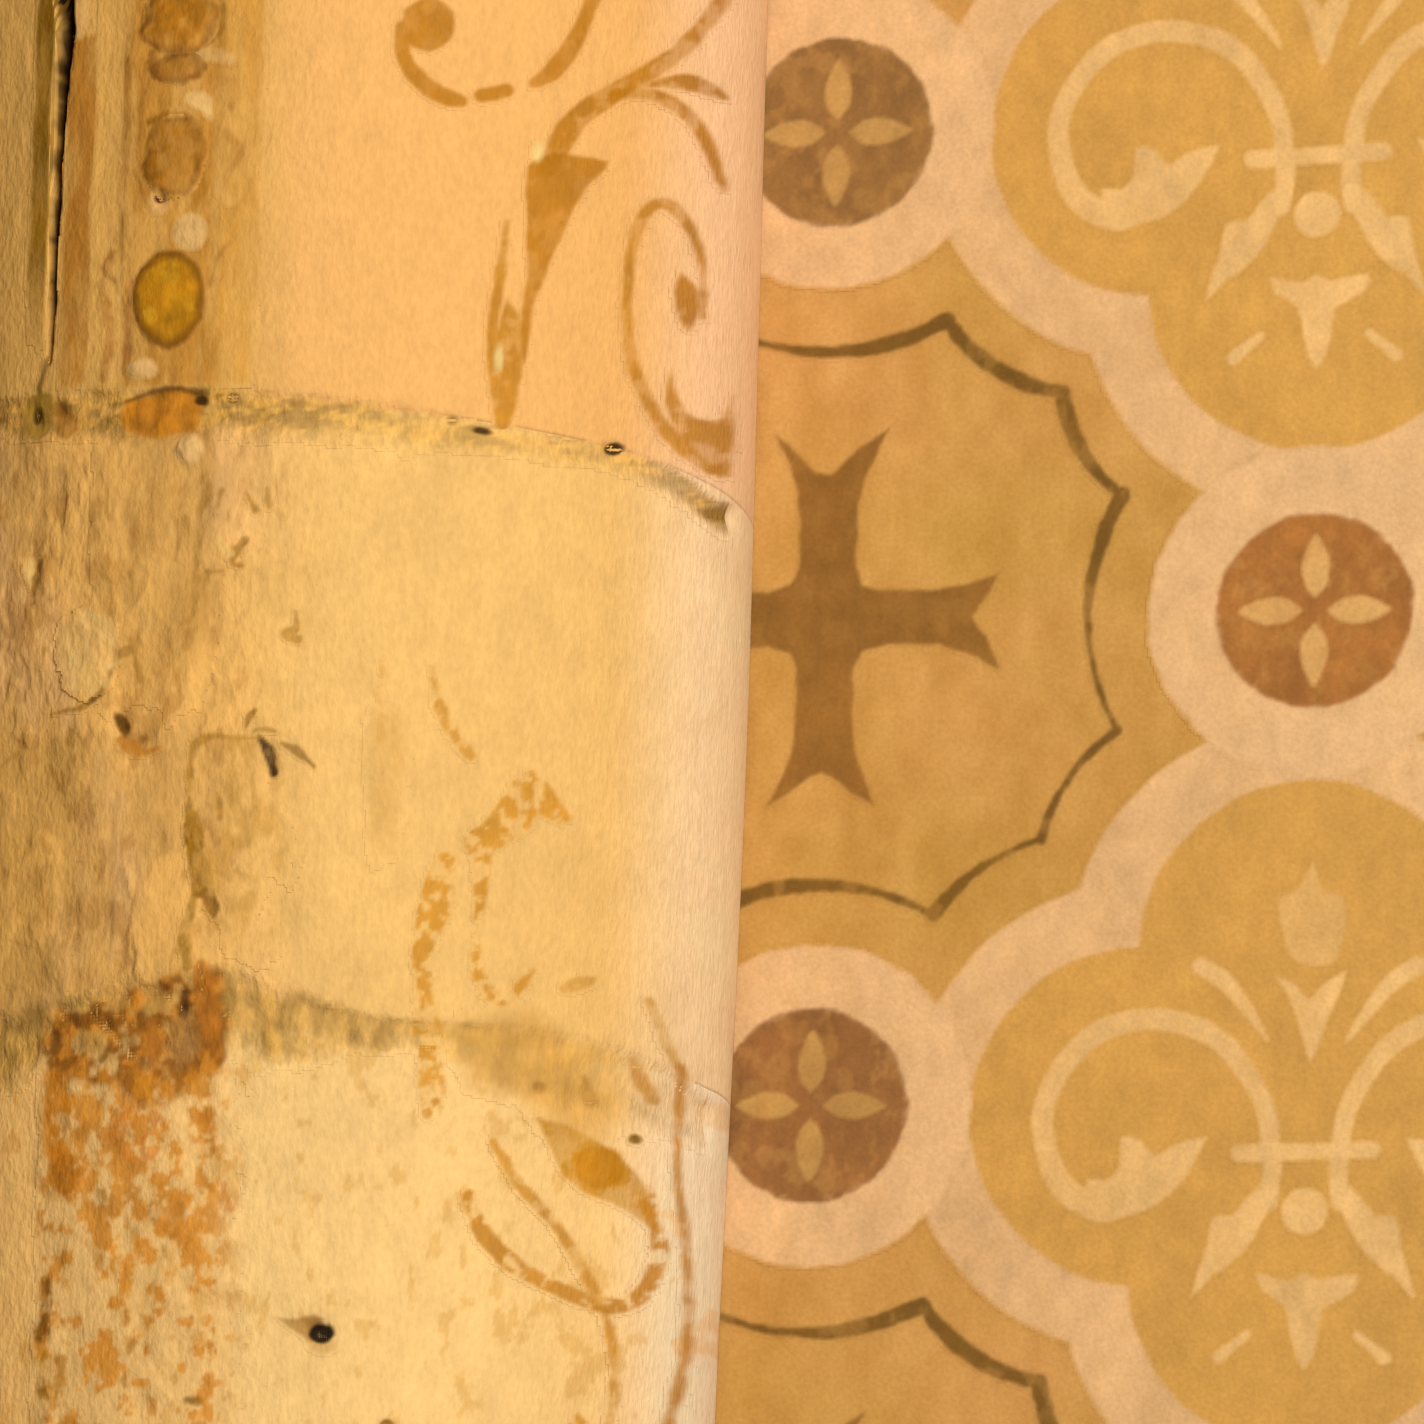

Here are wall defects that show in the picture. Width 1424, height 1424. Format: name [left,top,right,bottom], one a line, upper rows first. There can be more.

crack [35,0,92,391]
peeling [26,1054,254,1424]
damp [439,996,632,1158]